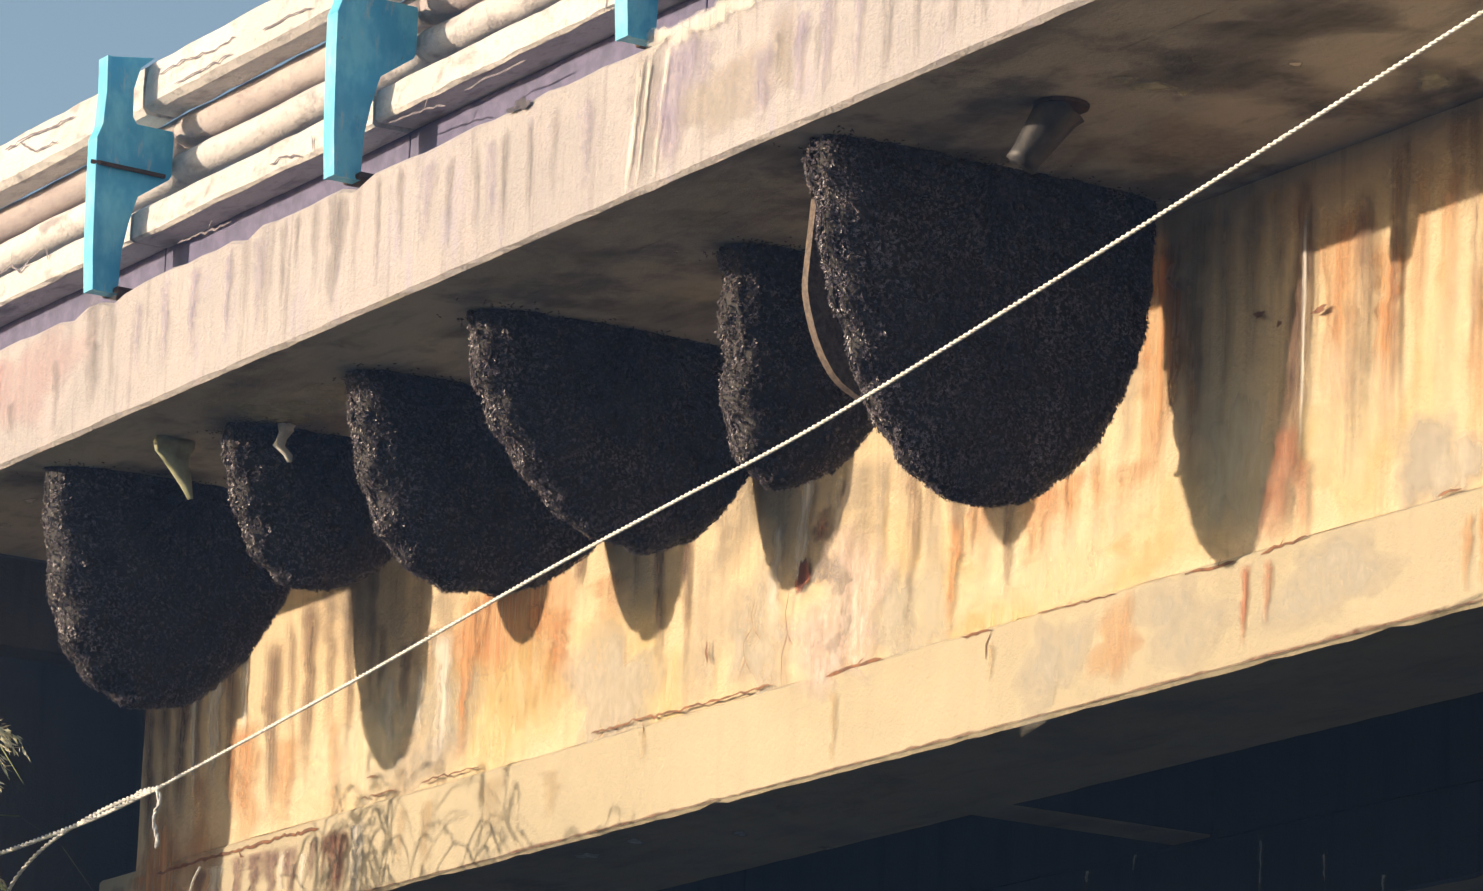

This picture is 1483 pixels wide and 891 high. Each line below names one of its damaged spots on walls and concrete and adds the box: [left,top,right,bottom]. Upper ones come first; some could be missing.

water stain [627,53,691,171]
corrosion [1144,252,1194,429]
crack [592,594,793,737]
crack [962,629,992,657]
corrosion [364,583,1483,891]
corrosion [135,826,177,891]
crack [157,827,318,875]